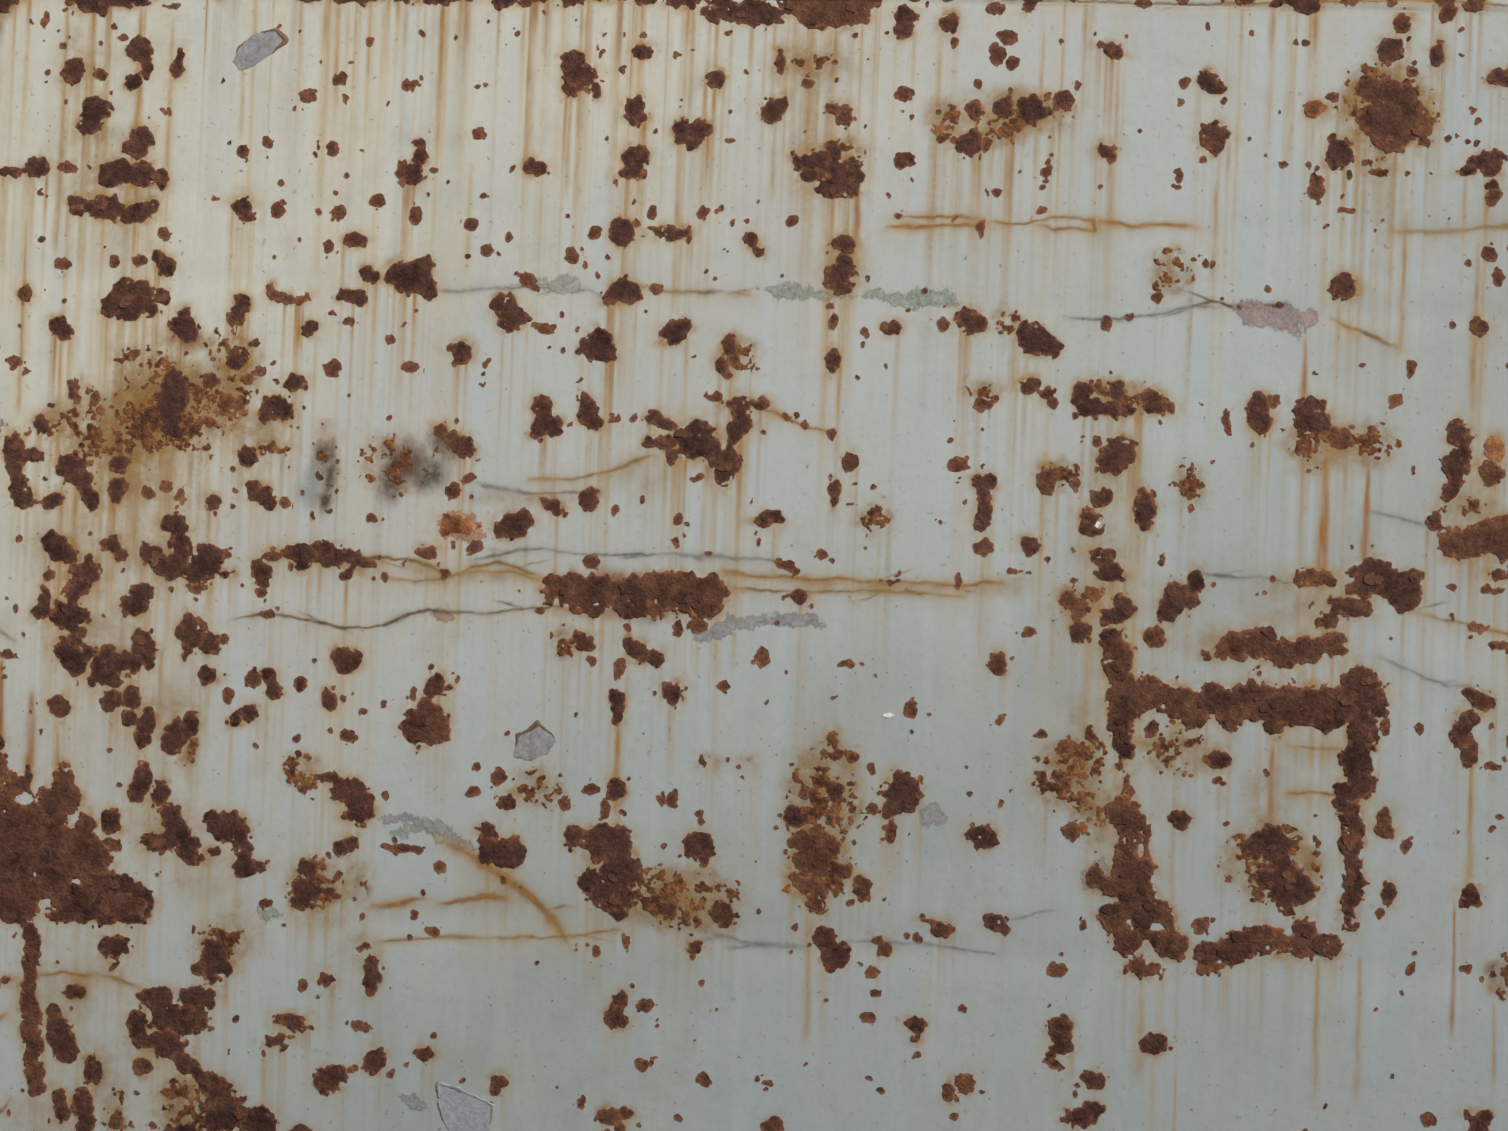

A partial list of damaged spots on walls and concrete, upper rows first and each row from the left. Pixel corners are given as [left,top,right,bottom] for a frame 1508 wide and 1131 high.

peeling [234,28,289,70]
rust [791,102,870,330]
rust [931,0,1082,214]
rust [1264,0,1508,229]
rust [489,198,891,549]
rust [937,305,1065,359]
rust [1425,418,1508,595]
peeling [514,720,556,760]
rust [465,551,761,960]
rust [1016,360,1425,980]
rust [774,731,956,1025]
peeling [400,1082,495,1131]